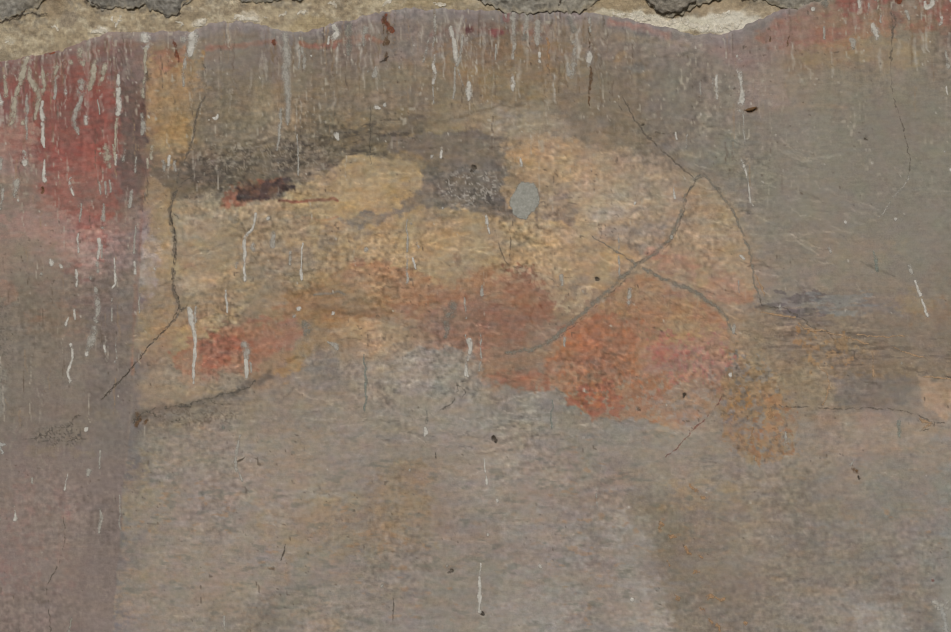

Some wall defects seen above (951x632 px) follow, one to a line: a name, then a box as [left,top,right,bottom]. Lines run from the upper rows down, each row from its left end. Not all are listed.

leakage [0,48,176,182]
leakage [140,33,150,98]
spalling [0,0,501,62]
spalling [574,0,784,36]
leakage [66,180,117,383]
crack [102,97,205,399]
crack [506,100,797,354]